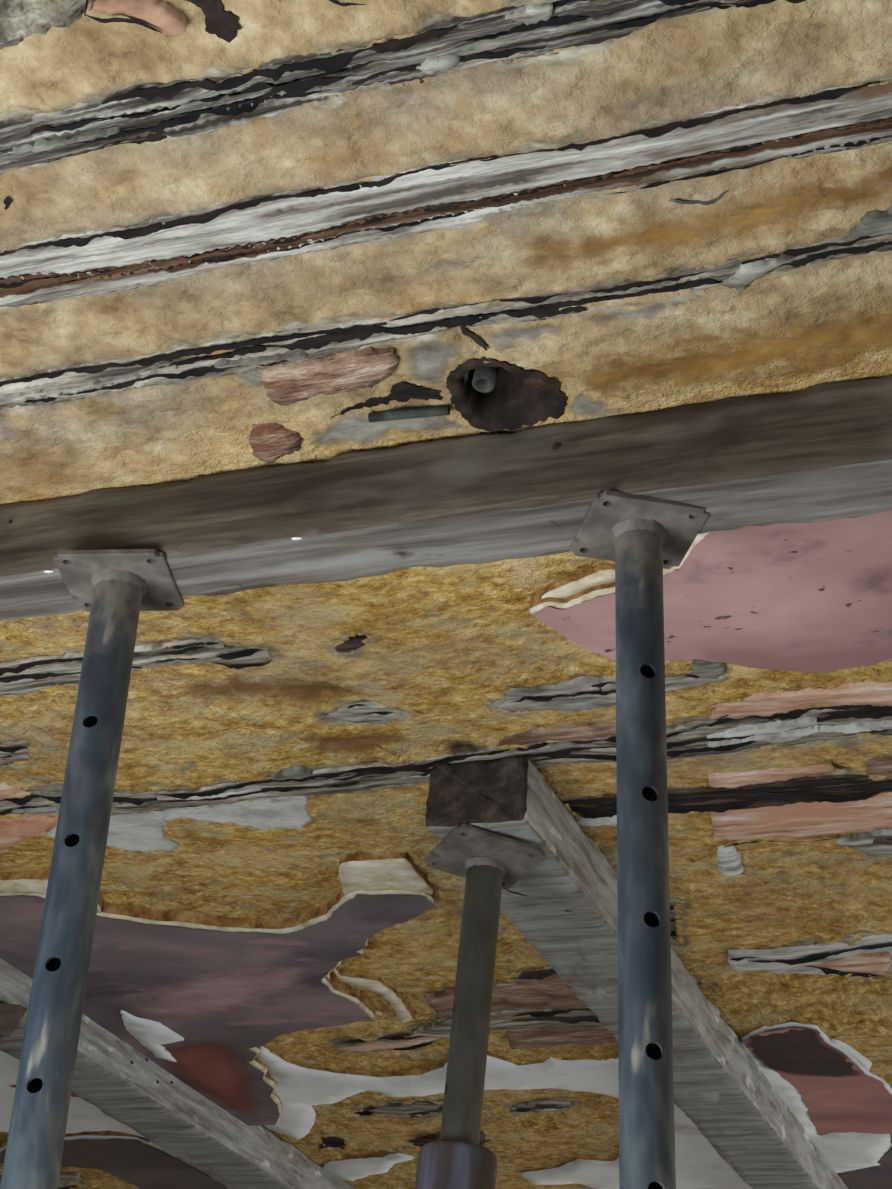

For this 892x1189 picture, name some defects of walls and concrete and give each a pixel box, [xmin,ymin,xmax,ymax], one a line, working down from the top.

spalling [0,0,187,49]
peeling [530,563,616,661]
peeling [663,511,892,748]
flaking render [707,764,834,788]
flaking render [710,792,892,877]
peeling [83,852,448,1140]
peeling [61,1091,228,1189]
peeling [323,1152,414,1181]
peeling [484,1052,619,1098]
peeling [521,1155,619,1189]
peeling [674,1103,753,1189]
peeling [741,1019,892,1189]